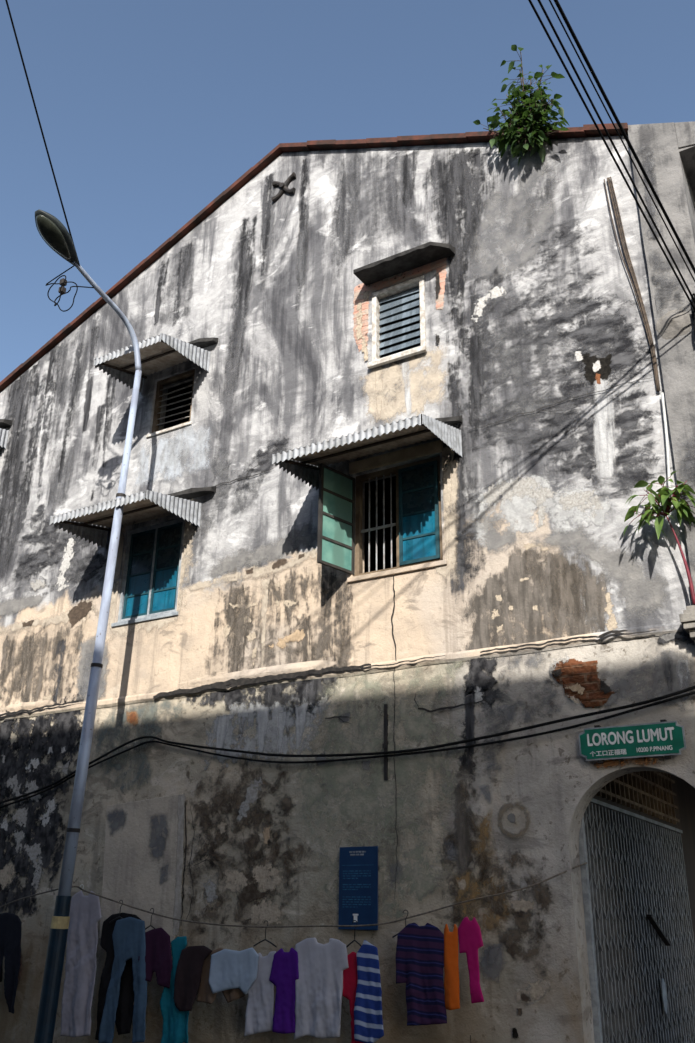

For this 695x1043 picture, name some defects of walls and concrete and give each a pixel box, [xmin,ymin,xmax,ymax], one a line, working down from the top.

leakage [154,242,193,325]
leakage [226,174,275,394]
leakage [296,160,310,308]
spalling [353,258,447,362]
spalling [575,351,612,385]
leakage [0,326,116,594]
peeling [189,549,317,590]
leakage [331,147,661,982]
leakage [0,624,108,917]
leakage [96,567,353,933]
spalling [550,656,615,708]
leakage [606,649,693,707]